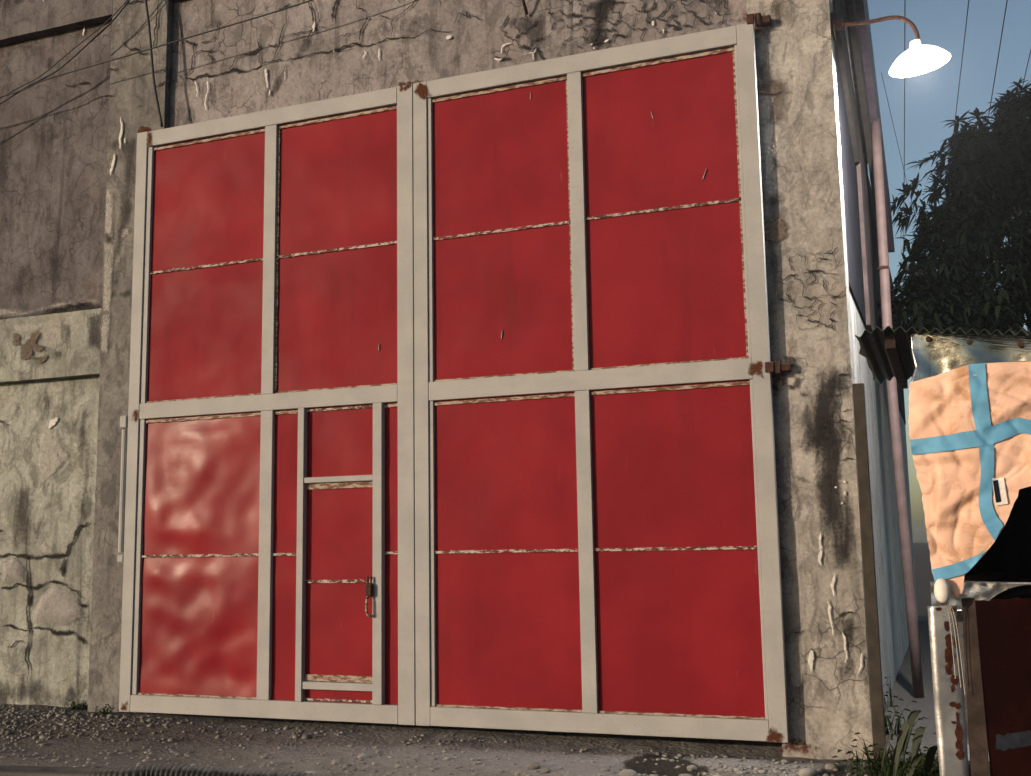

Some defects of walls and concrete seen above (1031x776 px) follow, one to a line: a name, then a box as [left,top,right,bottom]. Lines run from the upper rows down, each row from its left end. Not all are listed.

crack [66,0,728,108]
crack [779,247,846,331]
crack [0,522,89,678]
water stain [804,370,862,677]
corrosion [780,740,816,753]
corrosion [935,607,964,760]